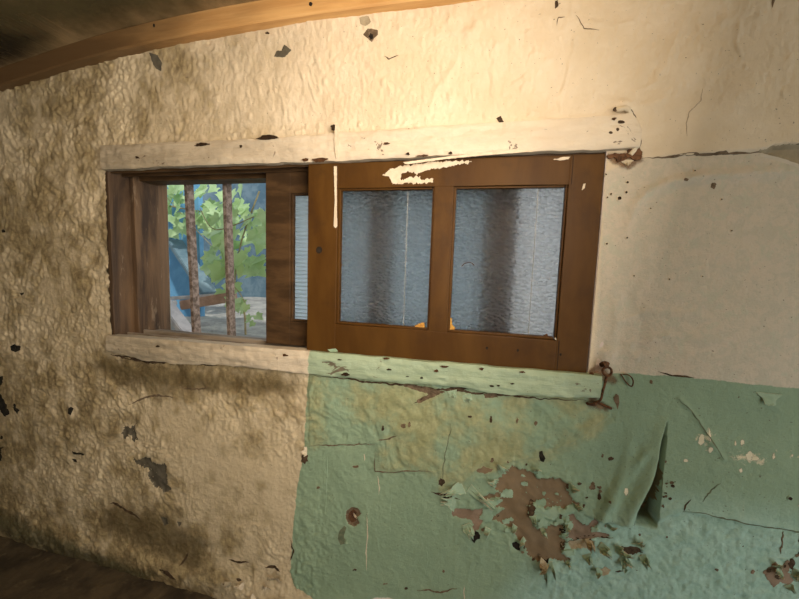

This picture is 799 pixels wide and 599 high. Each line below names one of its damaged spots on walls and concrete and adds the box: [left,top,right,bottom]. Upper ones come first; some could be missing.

water stain [0,0,192,64]
peeling [383,149,534,185]
flaking render [759,144,799,164]
water stain [102,360,290,391]
water stain [0,376,20,417]
spalling [133,457,171,493]
spalling [452,458,651,587]
spalling [751,552,799,595]